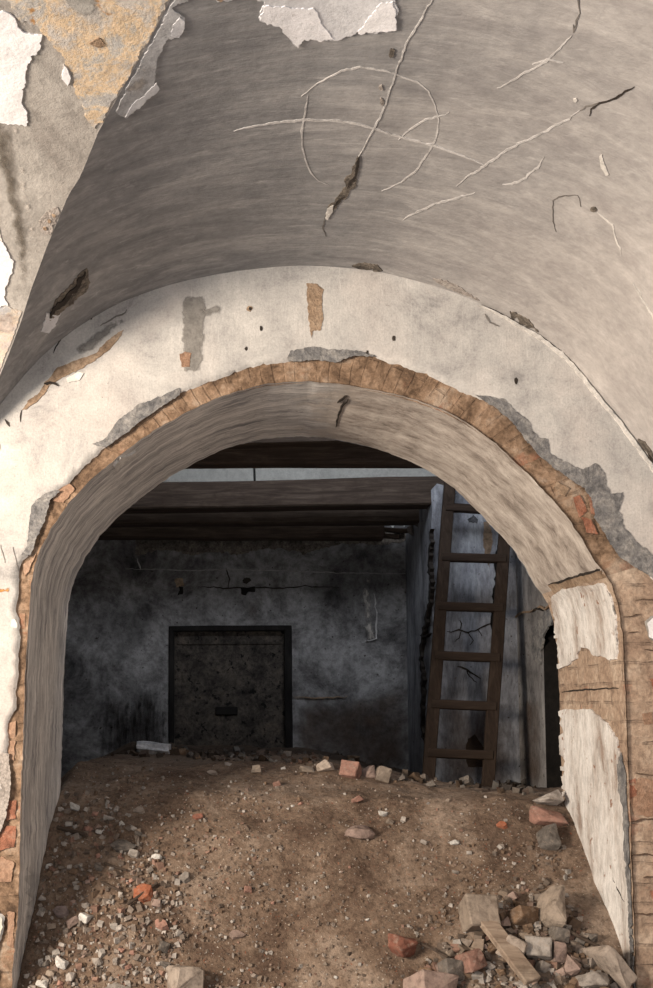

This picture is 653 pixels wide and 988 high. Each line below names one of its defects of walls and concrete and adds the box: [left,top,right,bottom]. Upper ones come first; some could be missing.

peeling [0,0,188,129]
peeling [257,0,399,47]
crack [497,0,580,89]
crack [322,1,432,236]
crack [552,195,622,256]
peeling [0,240,22,368]
crack [336,395,348,427]
crack [203,570,339,595]
flaking render [0,283,653,988]
crack [419,529,606,741]
crack [562,686,619,694]